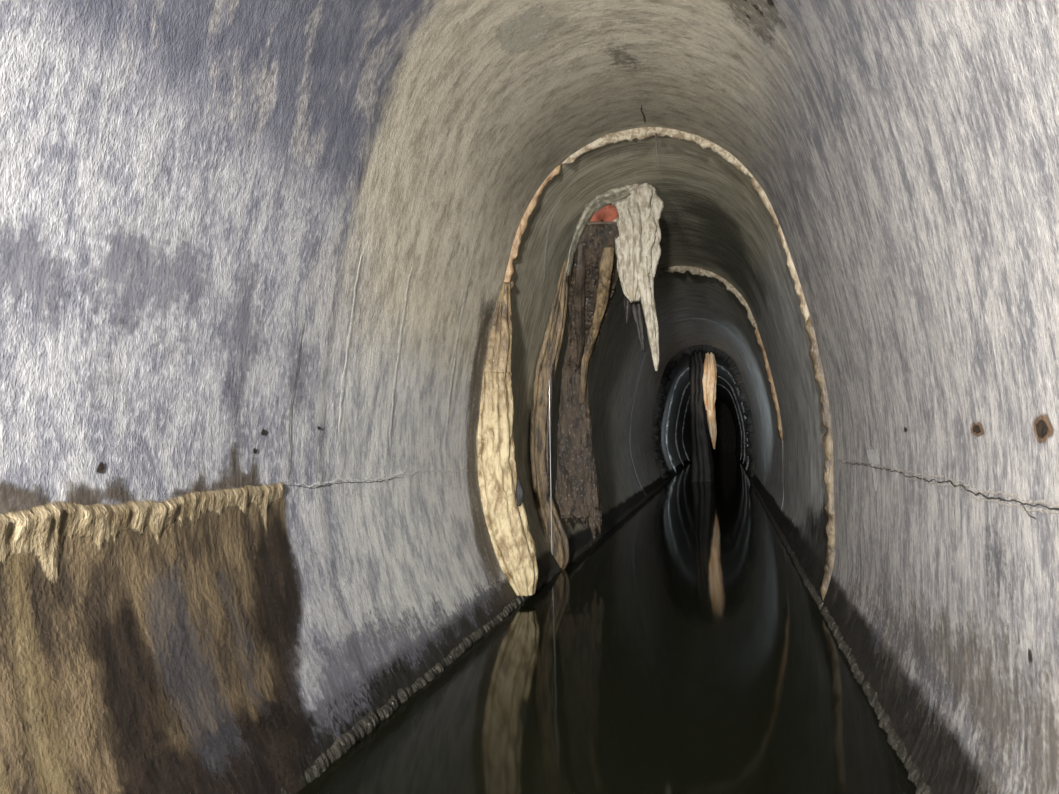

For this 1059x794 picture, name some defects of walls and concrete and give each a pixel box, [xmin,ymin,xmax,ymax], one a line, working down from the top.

damp [0,257,520,794]
crack [840,460,1059,519]